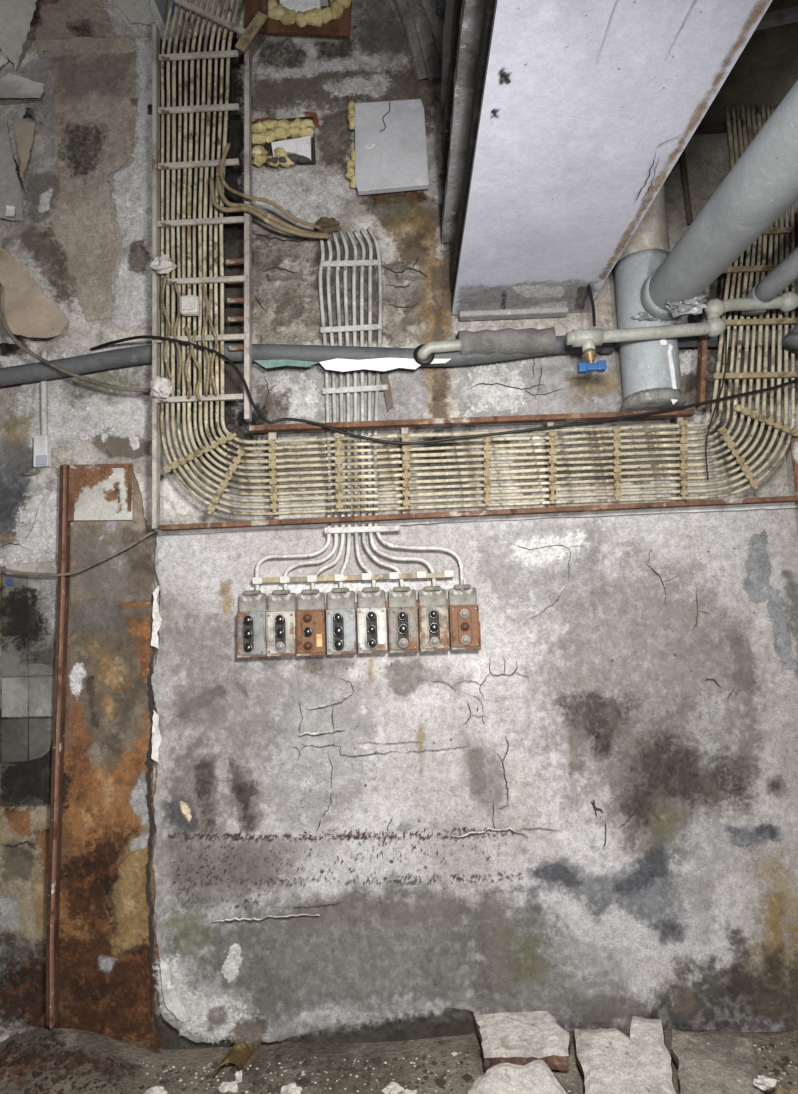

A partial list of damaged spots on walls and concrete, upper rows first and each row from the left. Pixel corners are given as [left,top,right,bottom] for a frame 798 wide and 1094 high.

leakage [34,36,136,58]
crack [666,0,697,59]
rust [670,0,767,160]
flaking render [0,0,152,331]
crack [635,136,678,201]
rust [599,171,666,279]
flaking render [0,323,33,368]
leakage [29,492,45,545]
rust [41,463,161,1052]
crack [293,659,562,838]
leakage [149,570,798,1050]